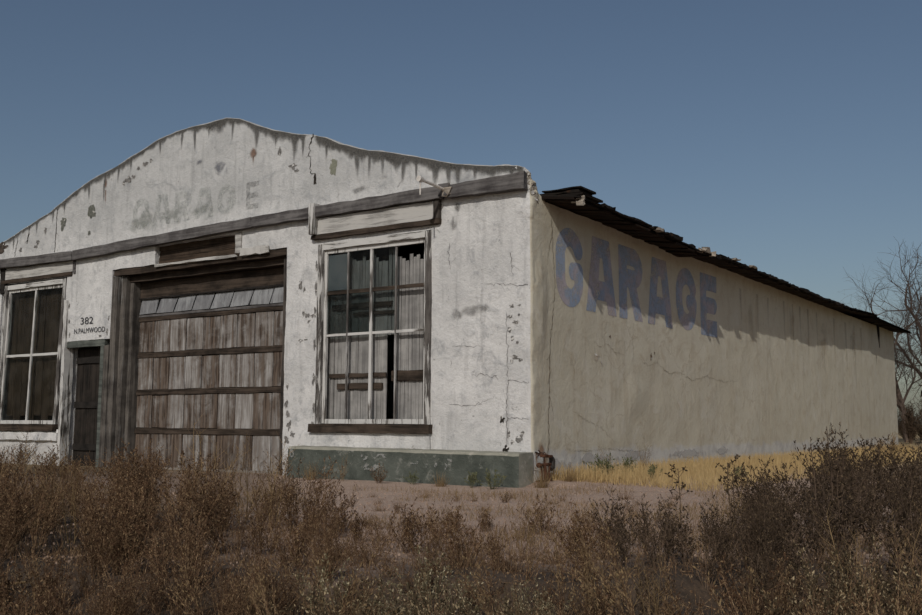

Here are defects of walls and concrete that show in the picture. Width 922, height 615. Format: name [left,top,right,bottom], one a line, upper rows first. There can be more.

water stain [5,118,305,246]
crack [308,134,316,184]
water stain [316,136,523,180]
crack [450,218,644,452]
flaking render [284,384,295,444]